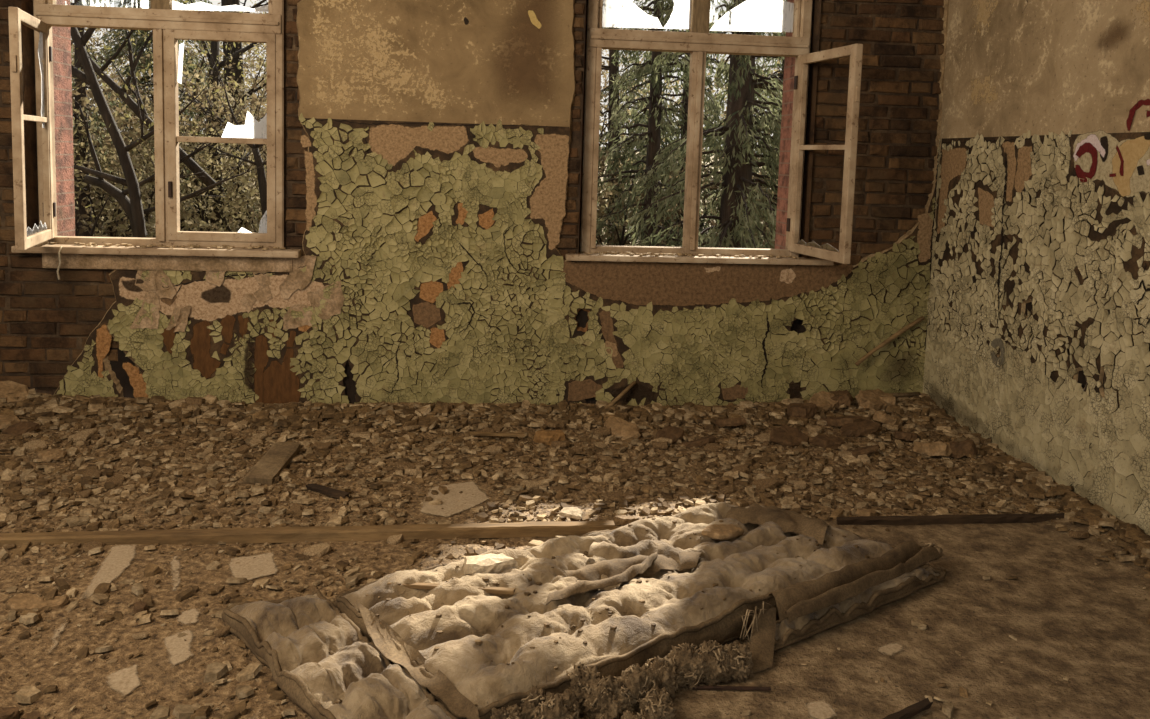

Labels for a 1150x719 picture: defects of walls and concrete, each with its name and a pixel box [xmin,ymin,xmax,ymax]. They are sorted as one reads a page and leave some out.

peeling [0,0,1150,535]
crack [757,312,786,388]